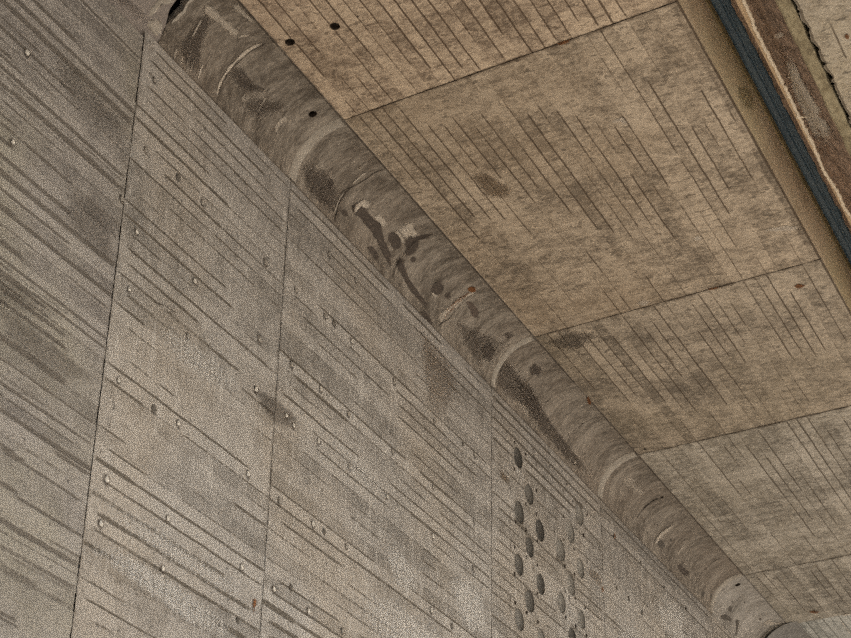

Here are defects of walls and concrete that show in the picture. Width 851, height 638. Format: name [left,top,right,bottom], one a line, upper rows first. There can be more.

spalling [731,0,851,234]
leakage [526,392,576,464]